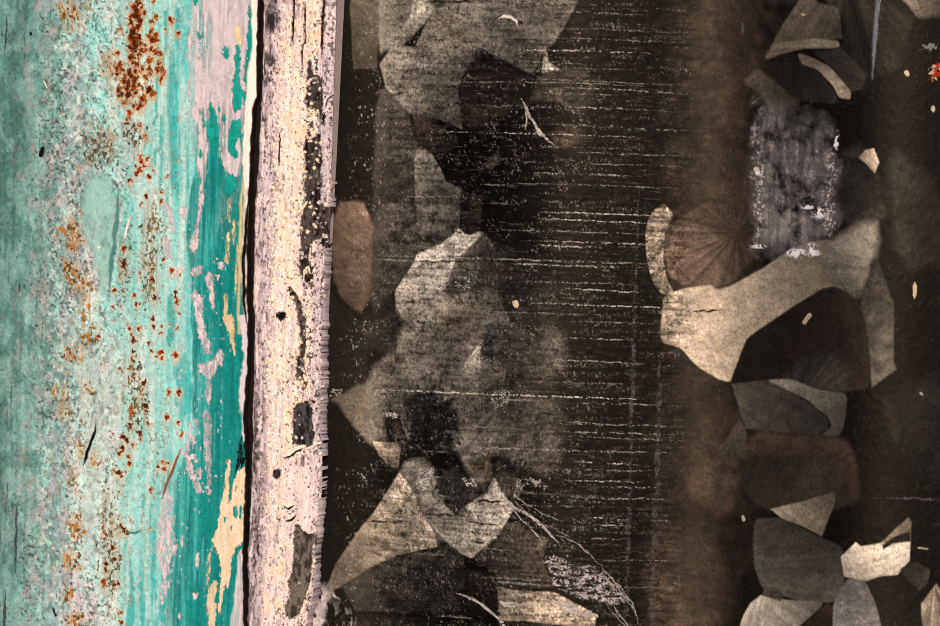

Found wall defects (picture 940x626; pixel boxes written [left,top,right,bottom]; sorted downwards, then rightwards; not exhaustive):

rust [928,63,940,82]
rust [55,222,101,362]
rust [77,0,183,626]
peeling [162,0,251,495]
spalling [276,61,333,474]
rust [47,381,103,419]
rust [61,475,95,626]
peeling [153,489,184,614]
peeling [192,459,252,626]
spalling [282,503,318,626]